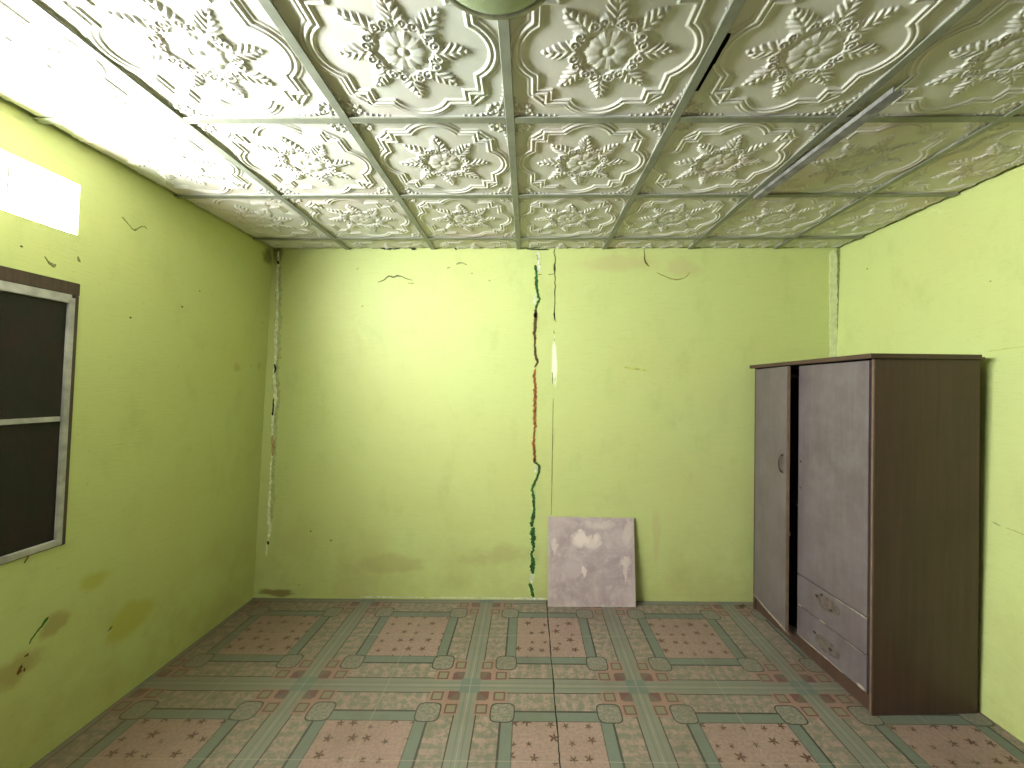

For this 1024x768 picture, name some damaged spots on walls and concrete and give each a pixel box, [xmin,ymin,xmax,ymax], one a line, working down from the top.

crack [528,249,561,768]
damp [98,587,169,653]
damp [254,587,305,598]